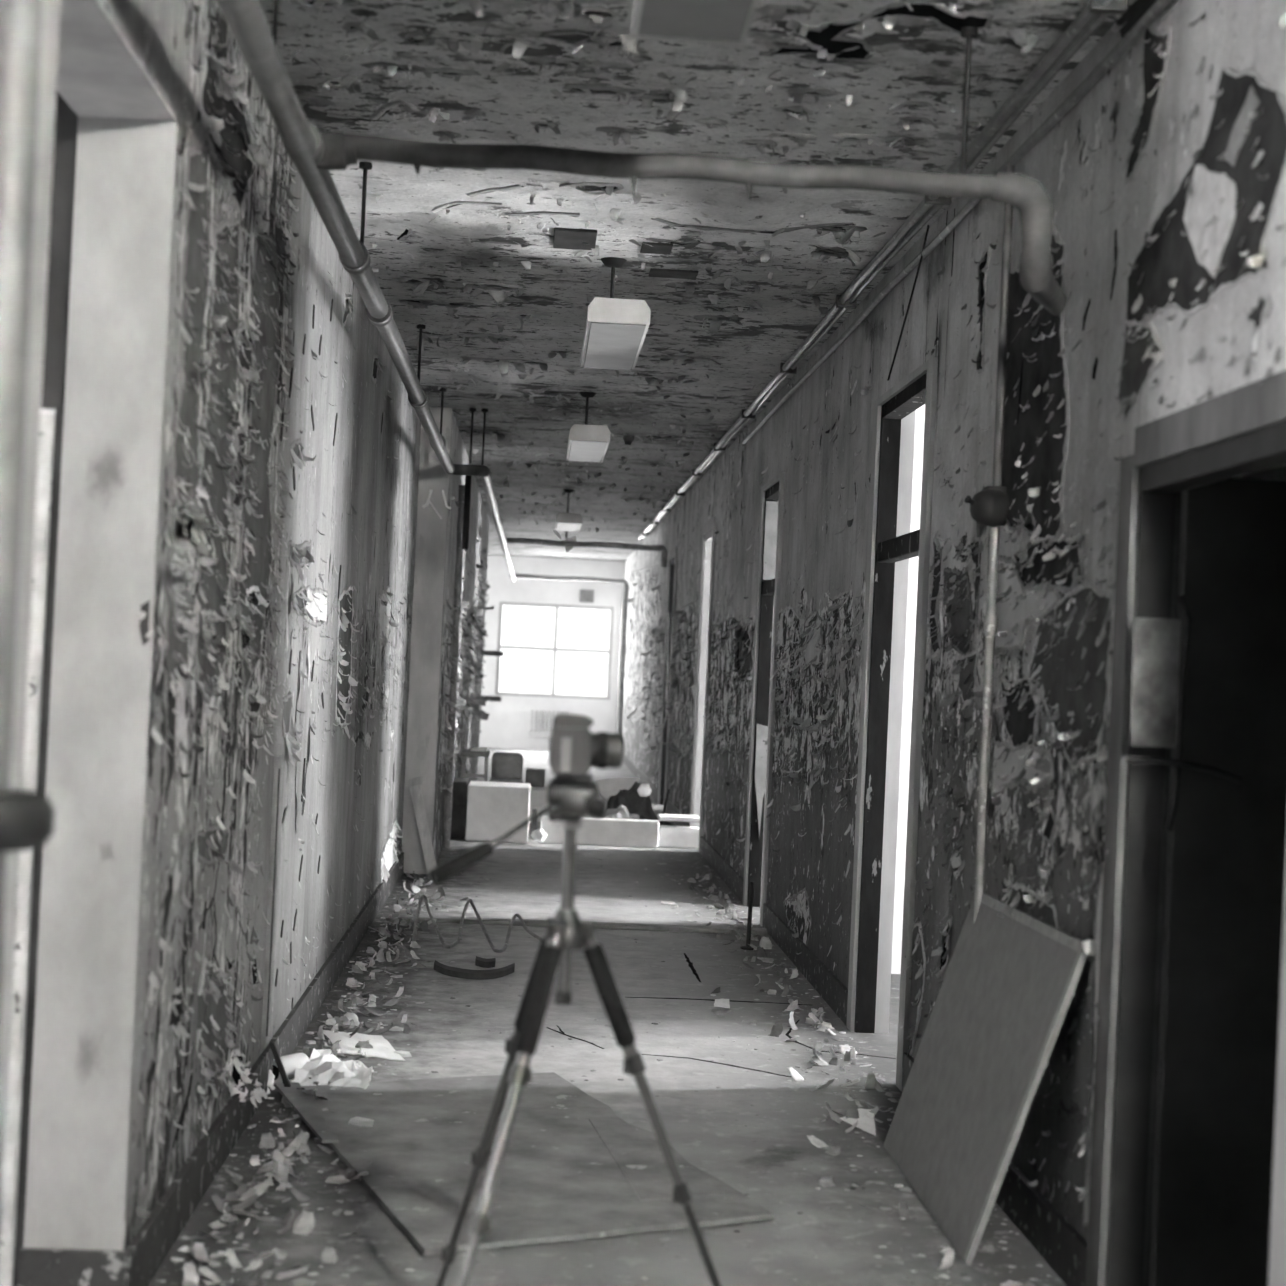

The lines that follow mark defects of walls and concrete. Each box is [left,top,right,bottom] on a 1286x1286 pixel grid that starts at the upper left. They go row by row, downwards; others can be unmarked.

peeling [321,61,483,94]
peeling [398,0,694,112]
peeling [739,87,939,157]
peeling [756,0,994,61]
peeling [565,182,624,196]
peeling [807,225,867,267]
peeling [975,243,992,373]
peeling [1115,67,1286,429]
peeling [137,45,359,765]
peeling [991,266,1114,797]
peeling [775,585,856,732]
peeling [925,536,980,709]